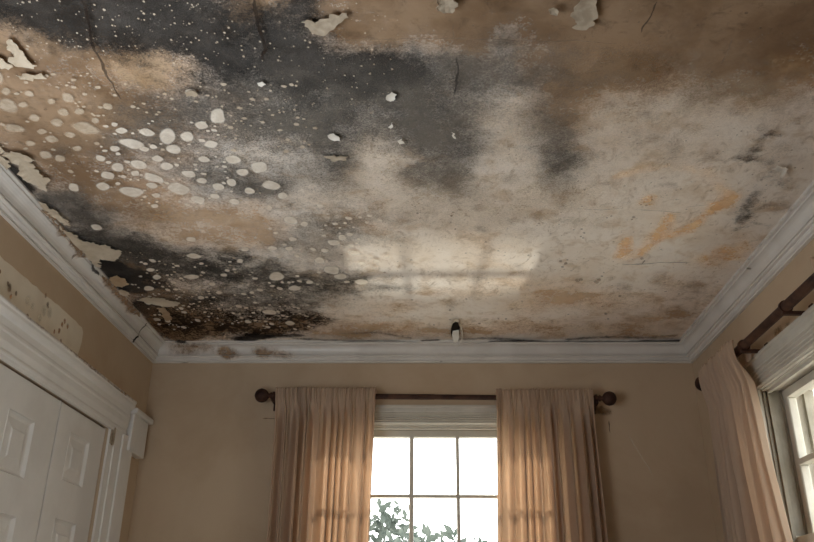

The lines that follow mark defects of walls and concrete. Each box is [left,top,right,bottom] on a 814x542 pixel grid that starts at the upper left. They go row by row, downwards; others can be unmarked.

crack [81,0,121,99]
flaking render [301,13,348,36]
flaking render [436,0,458,13]
flaking render [570,0,598,31]
peeling [0,147,50,192]
water stain [0,0,814,359]
peeling [38,201,122,268]
peeling [0,256,83,355]